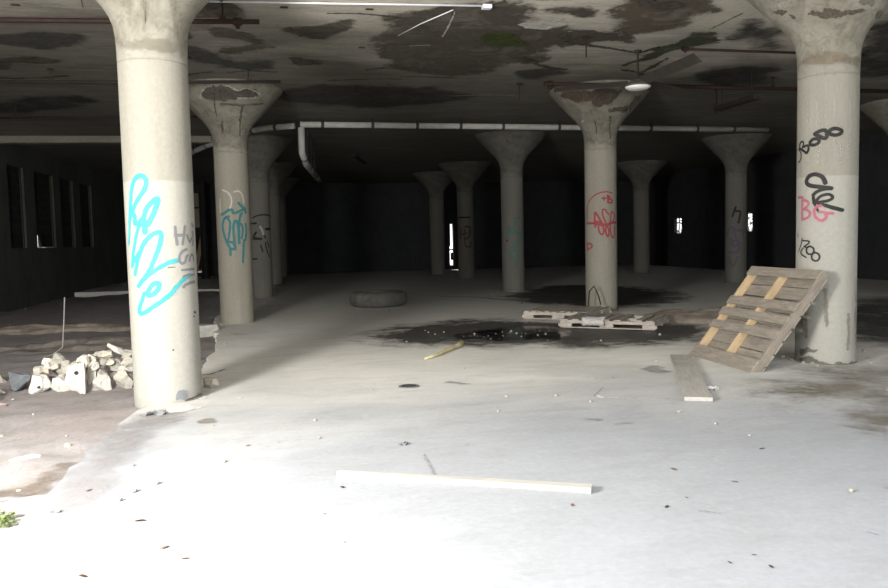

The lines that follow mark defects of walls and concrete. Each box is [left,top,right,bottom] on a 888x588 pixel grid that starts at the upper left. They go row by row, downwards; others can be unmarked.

damp [134,0,276,76]
damp [280,0,722,108]
spalling [808,8,865,19]
damp [859,0,888,77]
peeling [199,84,263,136]
damp [369,319,705,348]